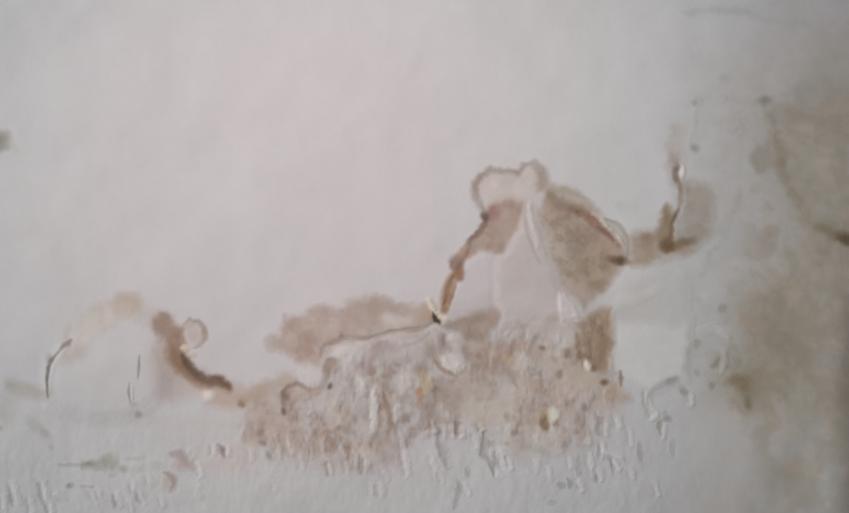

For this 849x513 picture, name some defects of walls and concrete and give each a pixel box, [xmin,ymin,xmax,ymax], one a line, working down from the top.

leakage [611,0,849,513]
crack [44,292,100,398]
peeling [118,428,256,503]
peeling [272,396,413,499]
peeling [349,374,381,435]
leakage [130,290,629,486]
peeling [421,417,515,510]
spalling [534,406,561,433]